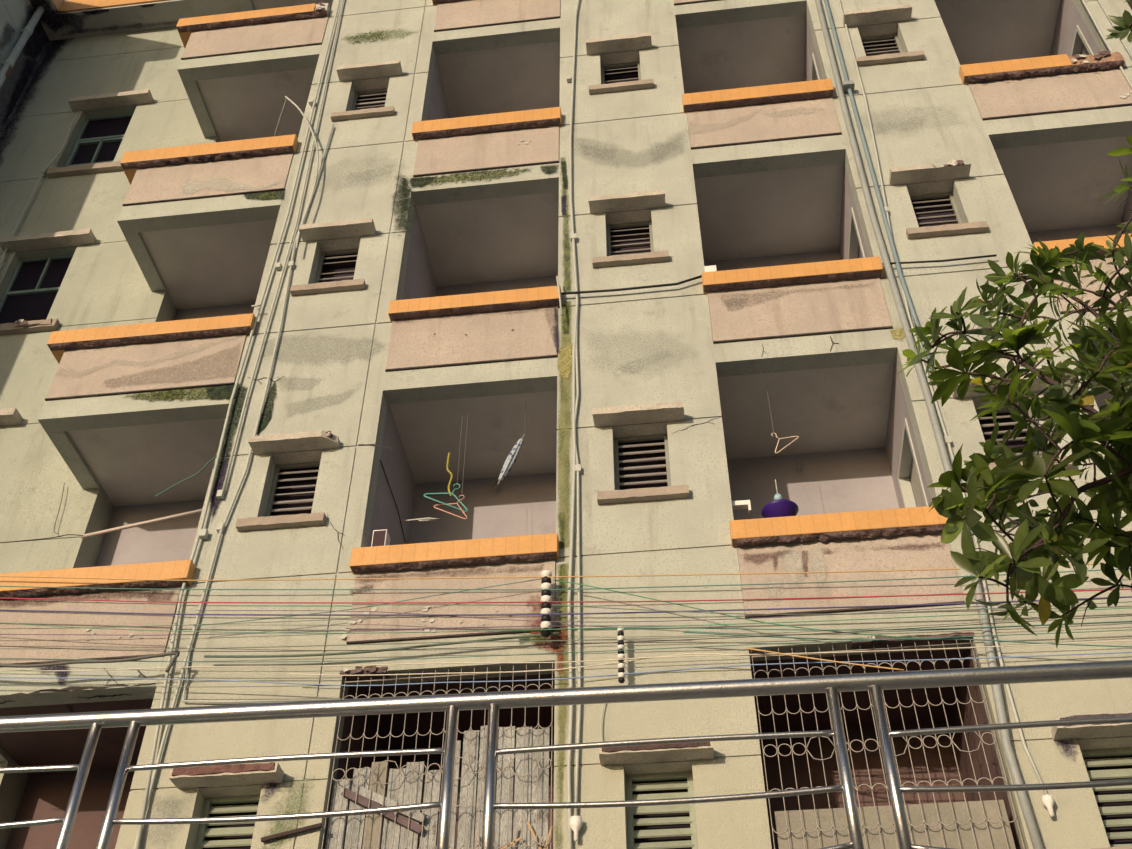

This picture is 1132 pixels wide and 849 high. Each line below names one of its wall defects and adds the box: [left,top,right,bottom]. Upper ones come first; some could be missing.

water stain [0,0,171,164]
water stain [393,176,436,232]
water stain [541,161,568,215]
water stain [546,305,569,352]
water stain [57,336,248,517]
corrosion [519,603,567,672]